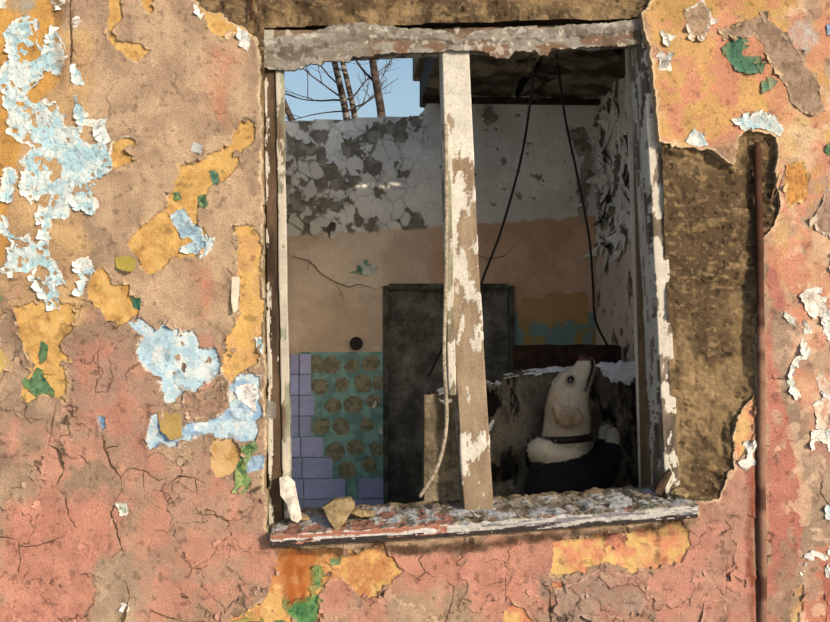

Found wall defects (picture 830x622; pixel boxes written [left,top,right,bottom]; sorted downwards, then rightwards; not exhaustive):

spalling [193,0,650,90]
peeling [684,0,825,116]
peeling [0,15,277,494]
crack [292,256,374,298]
spalling [654,110,811,502]
peeling [783,286,830,400]
crack [0,413,77,573]
crack [101,432,207,563]
crack [117,581,130,622]
peeling [230,545,420,622]
crack [411,550,454,622]
crack [534,583,567,622]